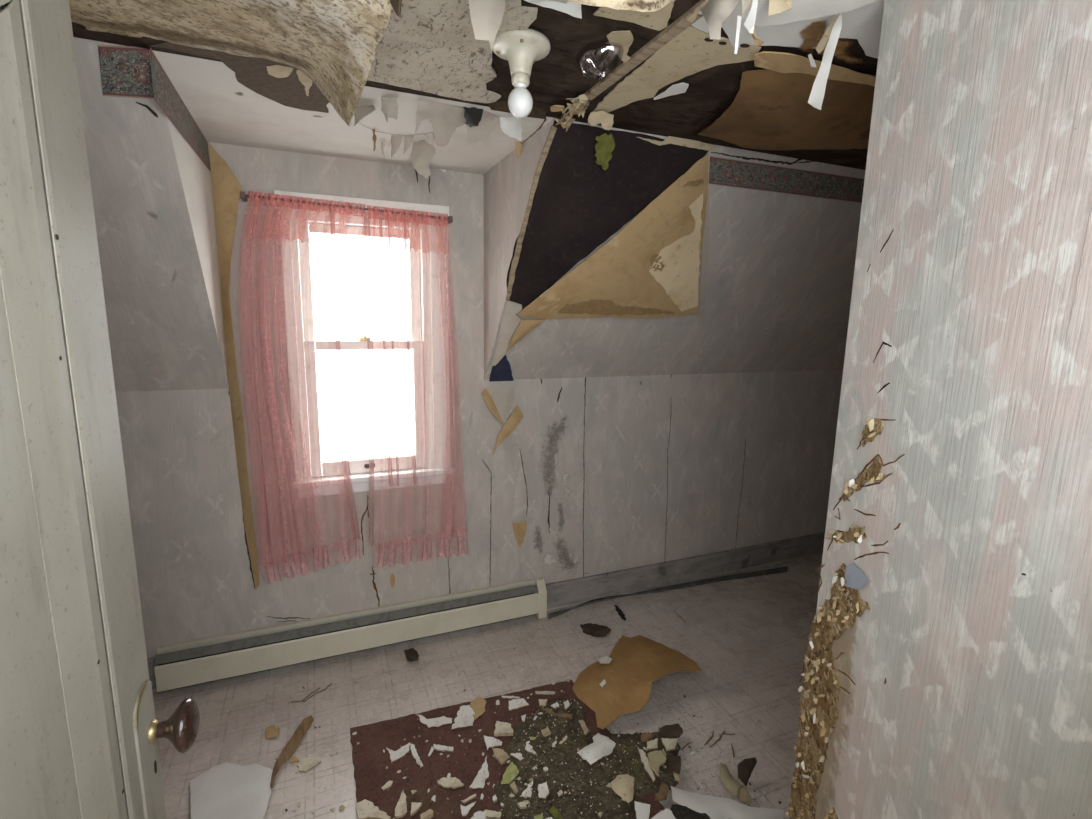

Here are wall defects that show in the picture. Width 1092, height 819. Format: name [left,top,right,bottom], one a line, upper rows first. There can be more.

leakage [627,0,665,10]
peeling [150,42,329,117]
peeling [481,120,709,454]
flaking render [857,416,896,450]
crack [361,495,380,607]
peeling [512,520,527,547]
flaking render [786,454,905,819]